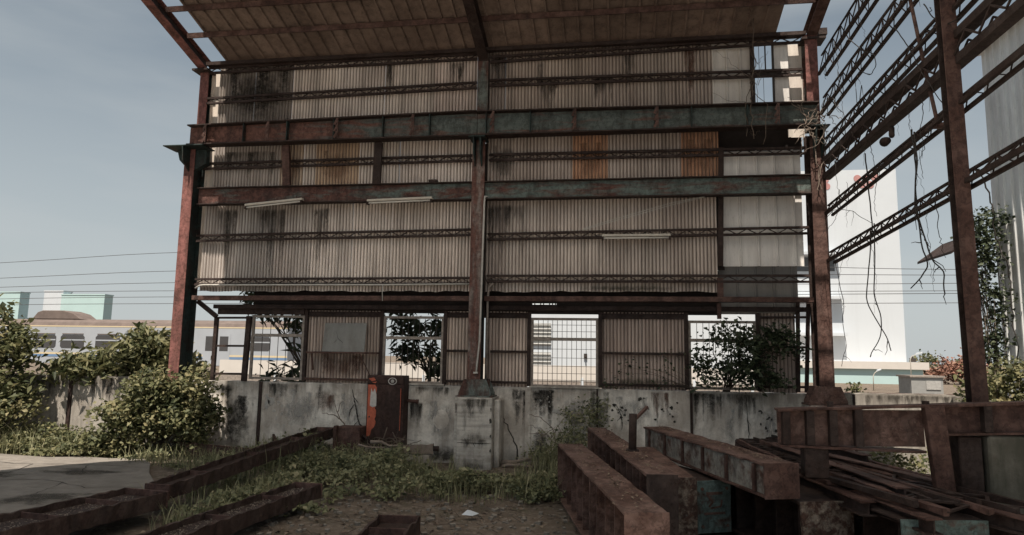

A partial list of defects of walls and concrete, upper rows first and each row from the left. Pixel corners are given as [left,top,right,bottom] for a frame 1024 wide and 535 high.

water stain [221,386,246,440]
water stain [411,387,449,431]
water stain [513,390,553,414]
water stain [694,393,755,437]